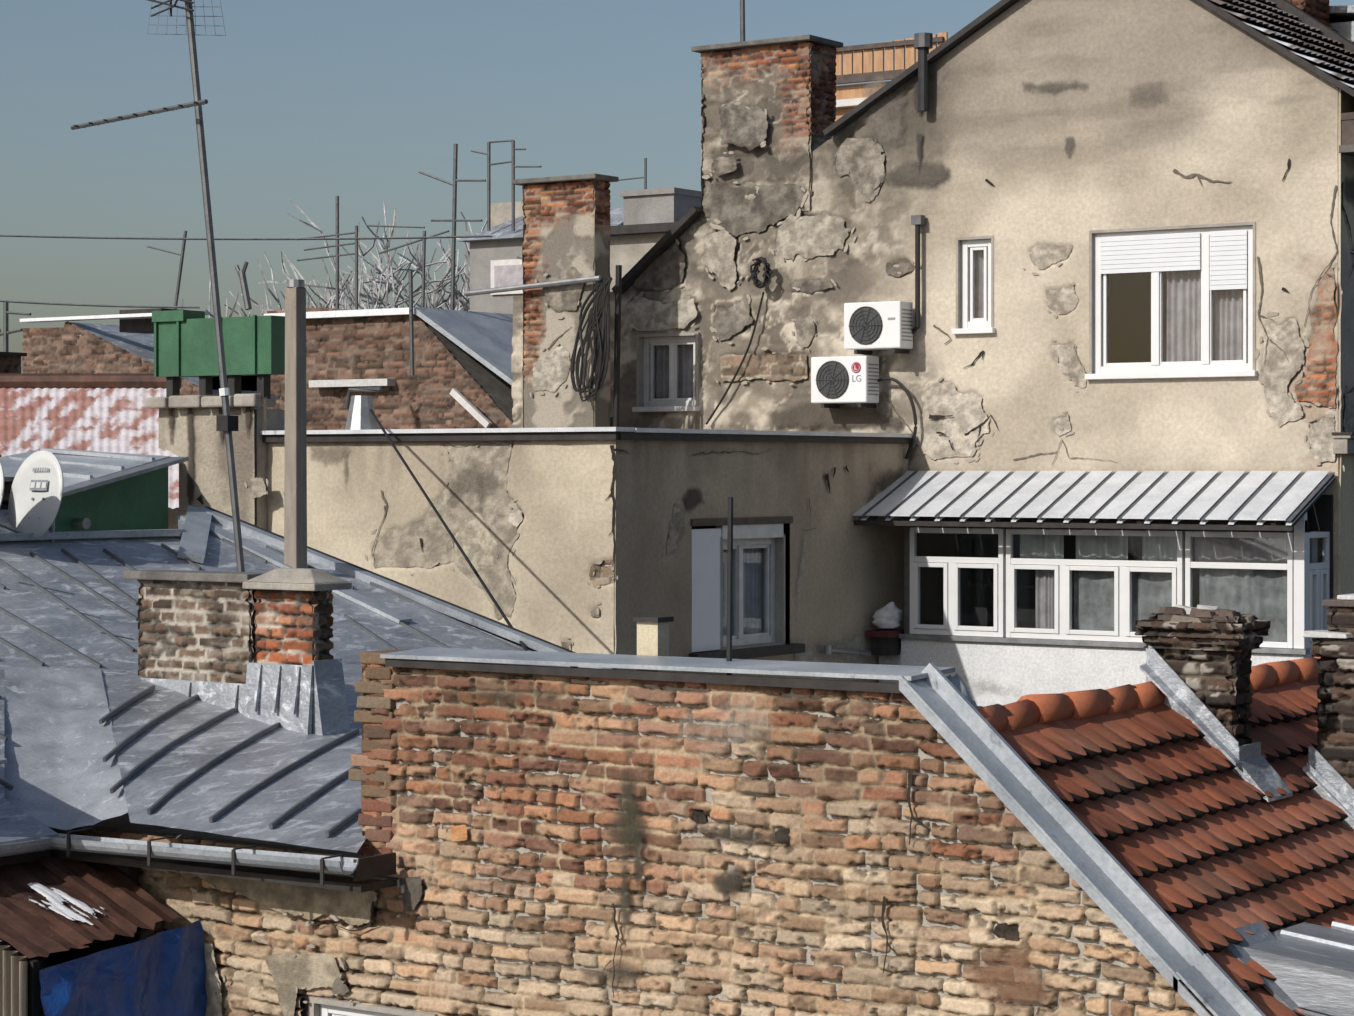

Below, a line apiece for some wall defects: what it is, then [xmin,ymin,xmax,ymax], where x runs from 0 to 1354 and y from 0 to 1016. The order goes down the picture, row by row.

spalling [834,137,885,202]
spalling [621,101,857,385]
peeling [1023,244,1073,275]
peeling [1045,282,1079,318]
peeling [1051,339,1087,393]
spalling [1255,263,1354,472]
spalling [913,378,994,464]
peeling [364,441,523,620]
crack [606,445,617,566]